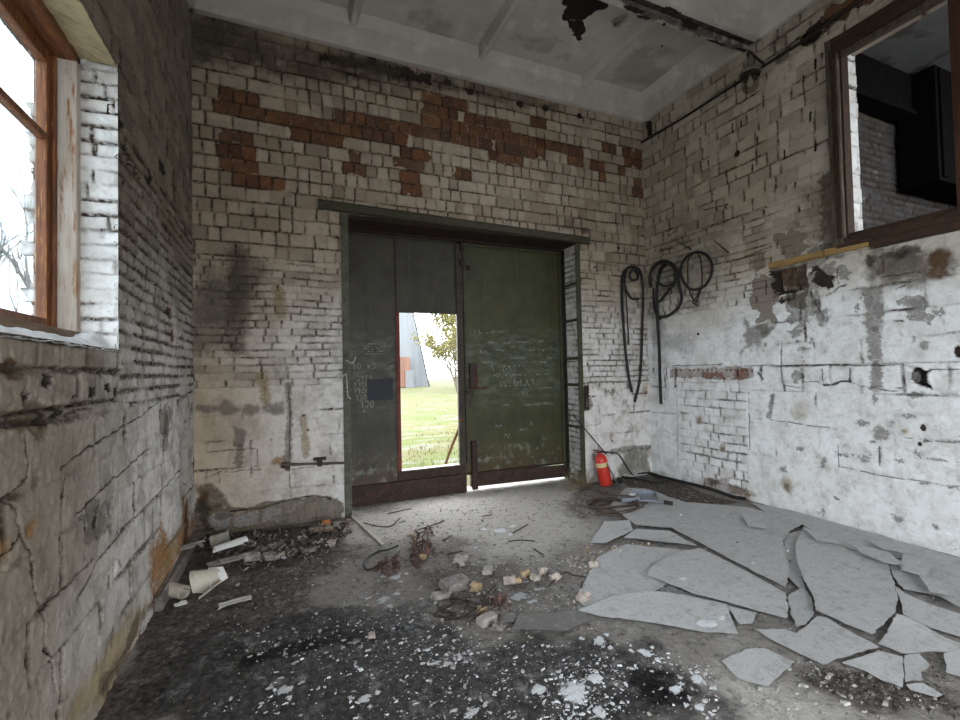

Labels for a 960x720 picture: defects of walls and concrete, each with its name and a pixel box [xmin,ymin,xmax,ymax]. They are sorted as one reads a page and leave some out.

peeling [562,0,609,41]
peeling [212,53,644,198]
peeling [746,227,852,351]
peeling [896,295,946,325]
peeling [896,371,930,399]
peeling [836,413,915,463]
crack [0,402,185,612]
spalling [708,478,744,494]
corrosion [149,497,195,604]
peeling [588,673,603,684]